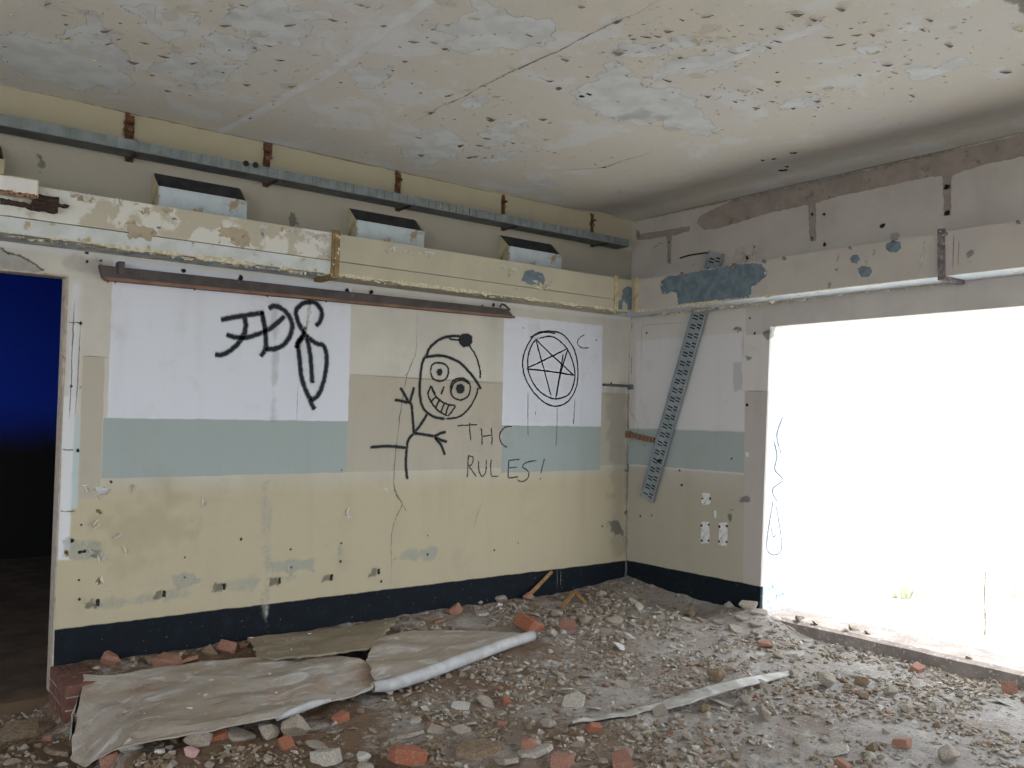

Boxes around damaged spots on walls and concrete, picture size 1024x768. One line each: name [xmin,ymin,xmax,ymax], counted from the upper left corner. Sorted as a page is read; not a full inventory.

peeling [570,9,834,137]
peeling [823,13,971,102]
crack [353,340,498,580]
peeling [0,133,1024,684]